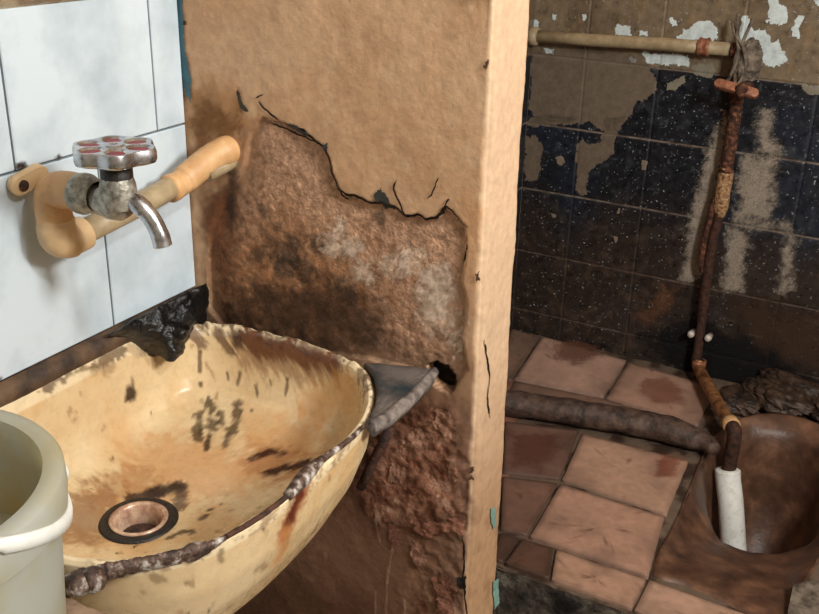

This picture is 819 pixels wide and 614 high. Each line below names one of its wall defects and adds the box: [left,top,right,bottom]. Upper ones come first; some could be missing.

peeling [523,48,716,196]
peeling [615,24,648,36]
peeling [669,17,718,41]
peeling [739,0,804,68]
peeling [801,83,819,95]
leakage [226,287,382,346]
peeling [215,119,467,373]
leakage [319,221,375,285]
leakage [382,249,464,359]
leakage [679,109,727,283]
leakage [720,109,795,295]
flaking render [355,400,474,569]